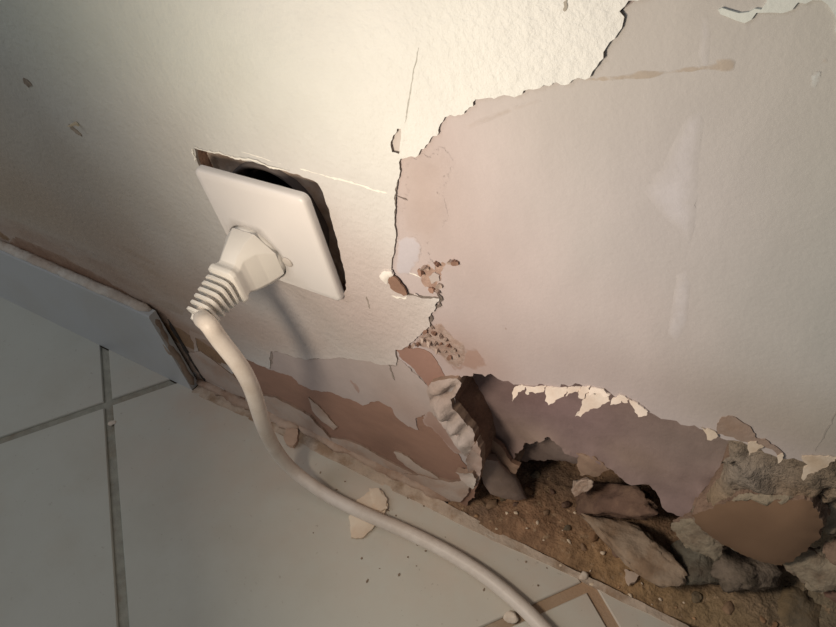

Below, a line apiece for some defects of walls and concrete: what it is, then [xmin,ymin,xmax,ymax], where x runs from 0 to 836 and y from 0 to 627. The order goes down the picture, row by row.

flaking render [189,351,250,410]
peeling [246,0,836,602]